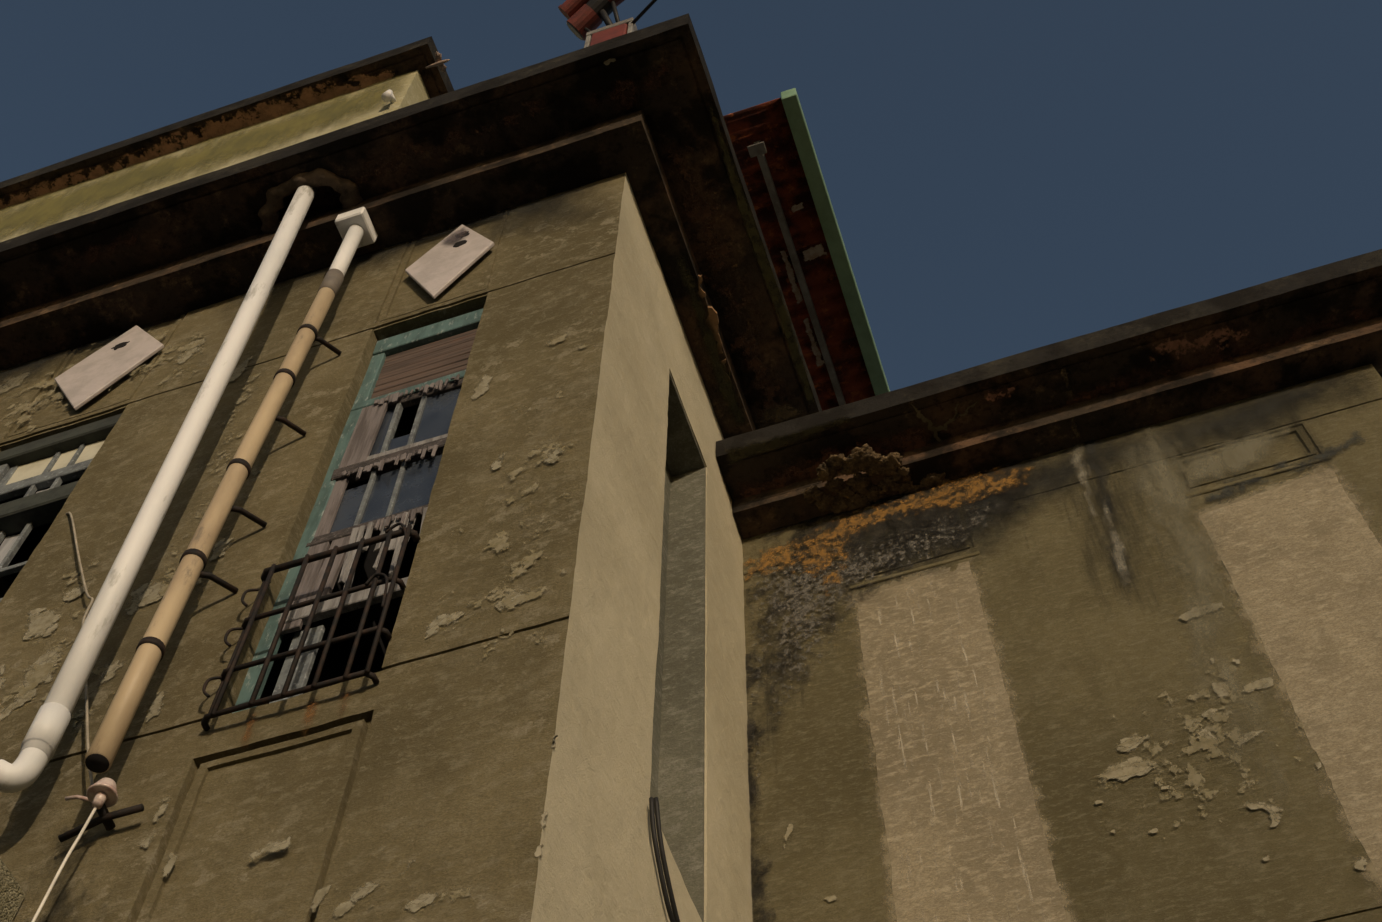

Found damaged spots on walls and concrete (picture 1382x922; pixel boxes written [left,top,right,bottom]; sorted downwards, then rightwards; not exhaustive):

peeling [0,364,75,433]
peeling [109,322,208,390]
peeling [471,375,493,400]
peeling [425,383,584,664]
water stain [1070,419,1129,576]
peeling [0,558,97,721]
water stain [751,502,999,715]
peeling [1095,652,1283,838]
peeling [310,881,380,922]